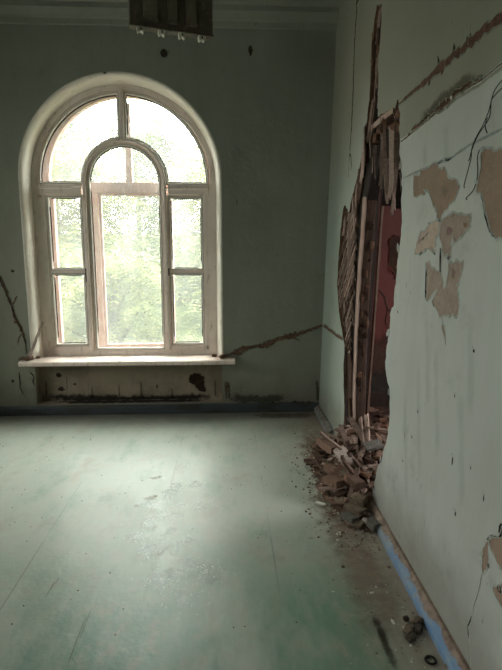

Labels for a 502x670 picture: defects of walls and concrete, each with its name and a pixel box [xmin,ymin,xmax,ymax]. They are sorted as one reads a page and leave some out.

spalling [366,7,382,143]
peeling [401,62,502,143]
peeling [474,146,502,241]
spalling [388,235,401,279]
peeling [413,160,472,345]
crack [0,275,28,354]
crack [223,324,343,357]
water stain [52,393,210,403]
spalling [188,372,207,392]
peeling [467,522,502,668]